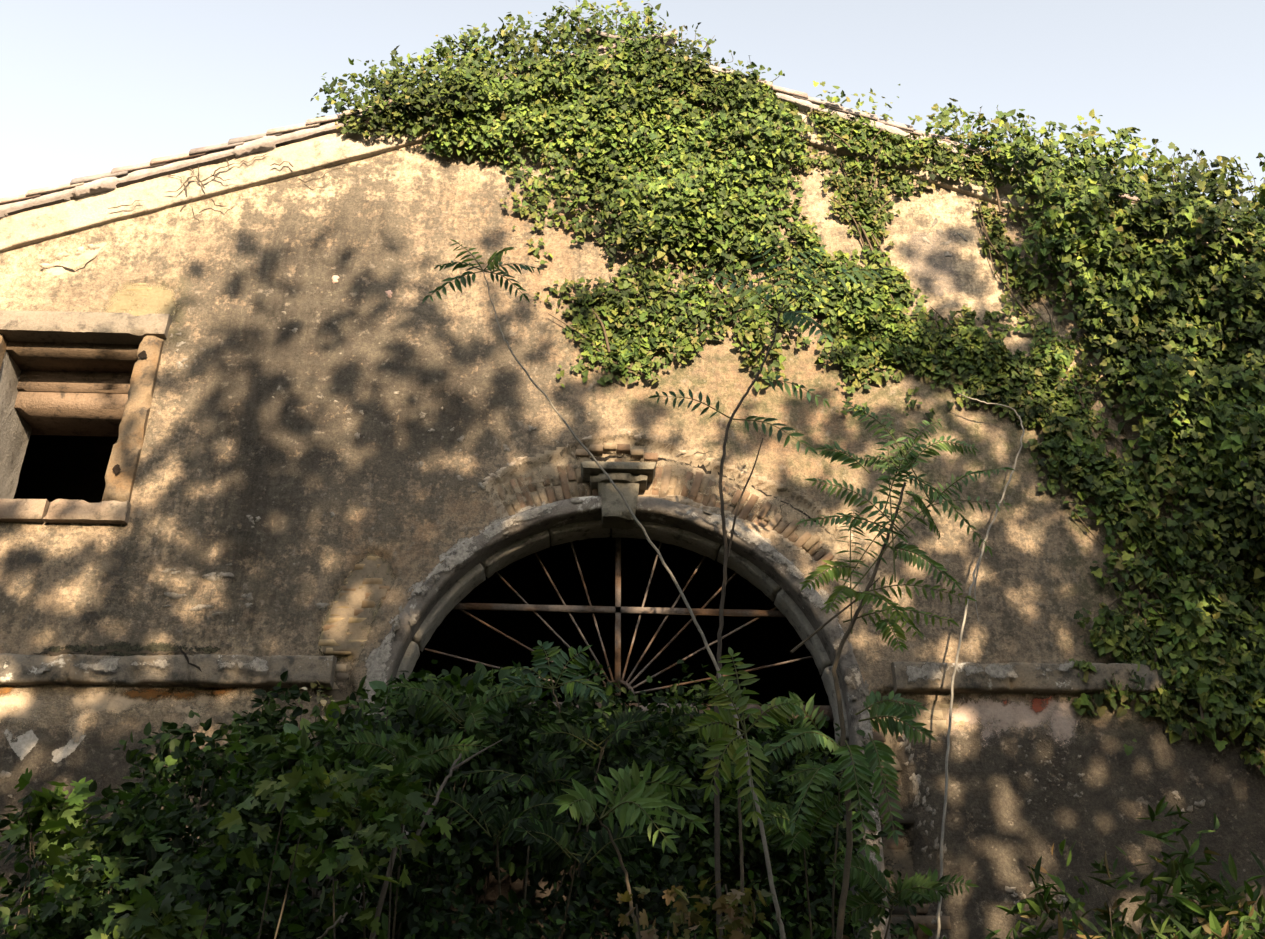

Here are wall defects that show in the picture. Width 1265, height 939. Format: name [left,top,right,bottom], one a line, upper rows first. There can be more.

crack [108,148,361,223]
crack [40,257,96,272]
flaking render [201,563,234,582]
flaking render [316,431,965,939]
flaking render [4,729,39,760]
flaking render [52,735,86,763]